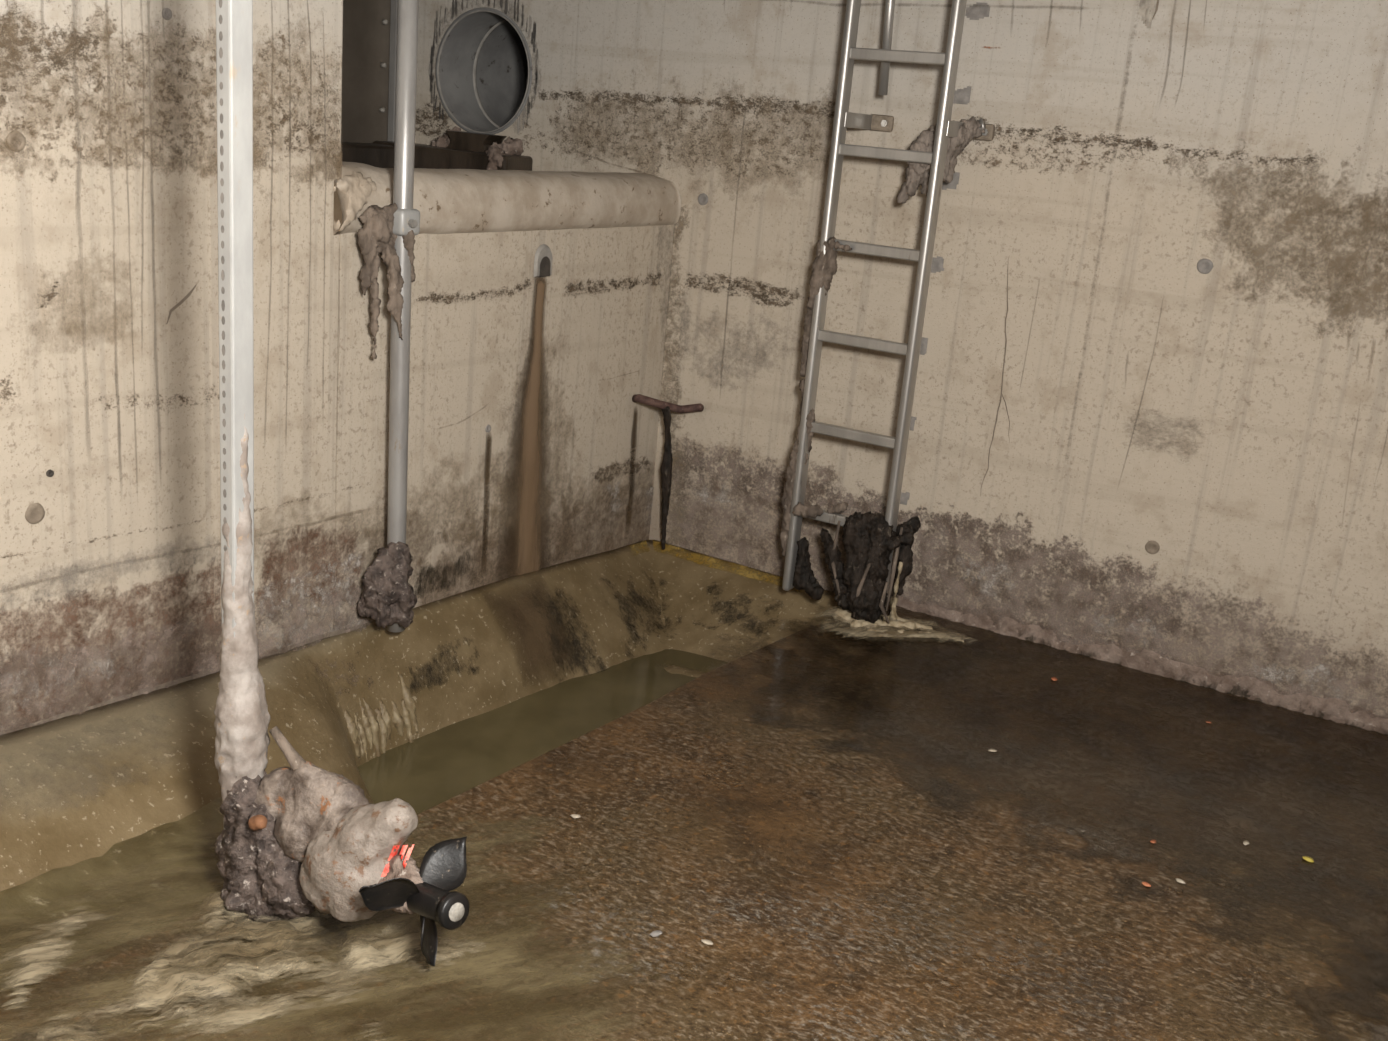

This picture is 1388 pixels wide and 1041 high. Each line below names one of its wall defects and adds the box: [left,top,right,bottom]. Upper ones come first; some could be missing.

water stain [0,6,217,171]
water stain [253,31,342,175]
water stain [517,71,835,180]
water stain [958,117,1388,331]
water stain [412,209,802,605]
water stain [214,413,385,803]
water stain [716,467,1388,994]